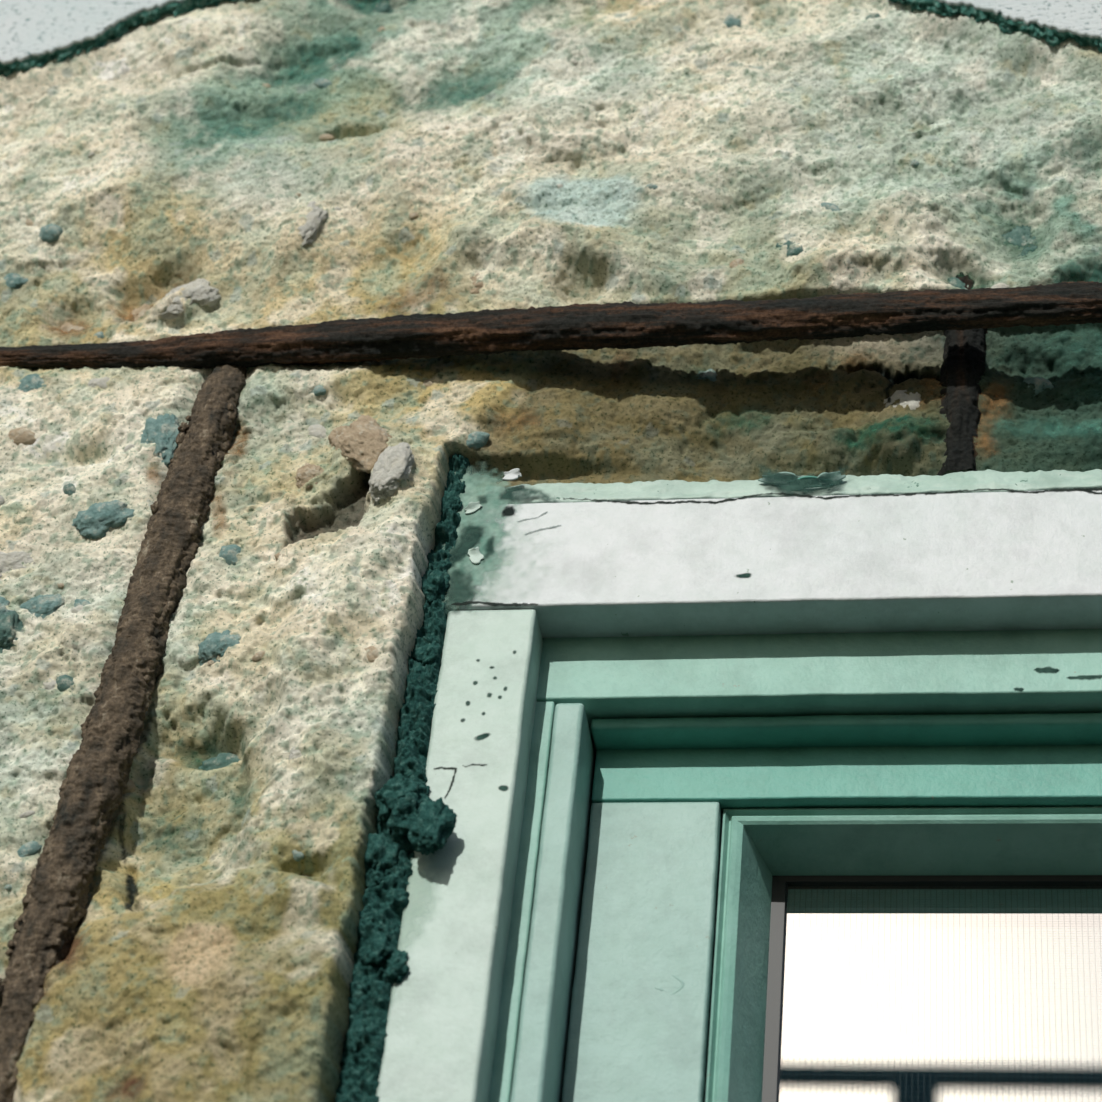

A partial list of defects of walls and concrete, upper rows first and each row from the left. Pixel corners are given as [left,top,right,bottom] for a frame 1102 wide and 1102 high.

spalling [0,0,1102,347]
spalling [0,366,214,981]
rust [0,272,1102,1102]
spalling [71,323,1102,1102]